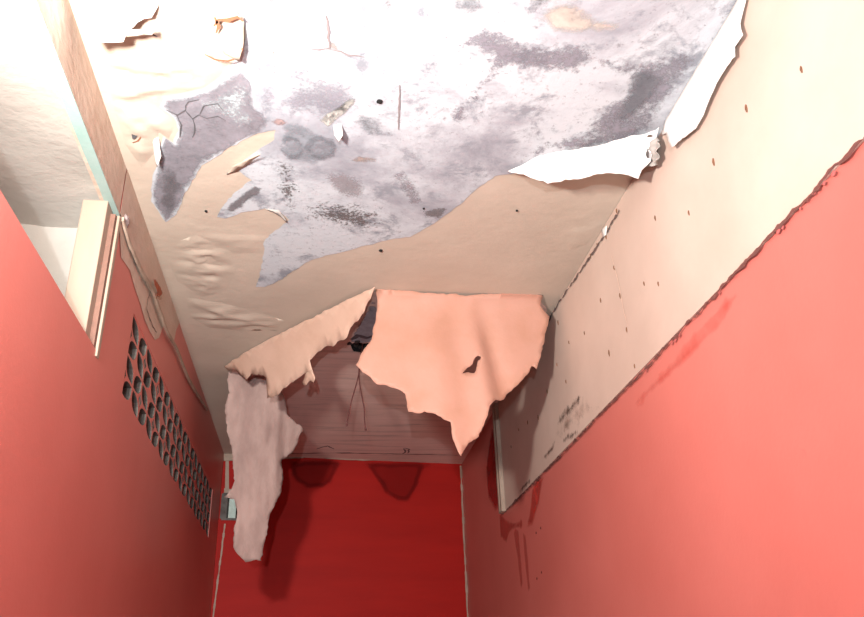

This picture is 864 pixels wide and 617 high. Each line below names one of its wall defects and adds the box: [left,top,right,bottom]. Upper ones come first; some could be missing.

leakage [466,30,588,75]
crack [167,100,226,138]
leakage [154,74,265,220]
leakage [280,125,333,196]
leakage [288,72,348,111]
peeling [151,0,737,287]
leakage [559,57,687,148]
mould [308,177,378,228]
mould [398,174,444,218]
spalling [282,292,498,464]
leakage [371,464,423,499]